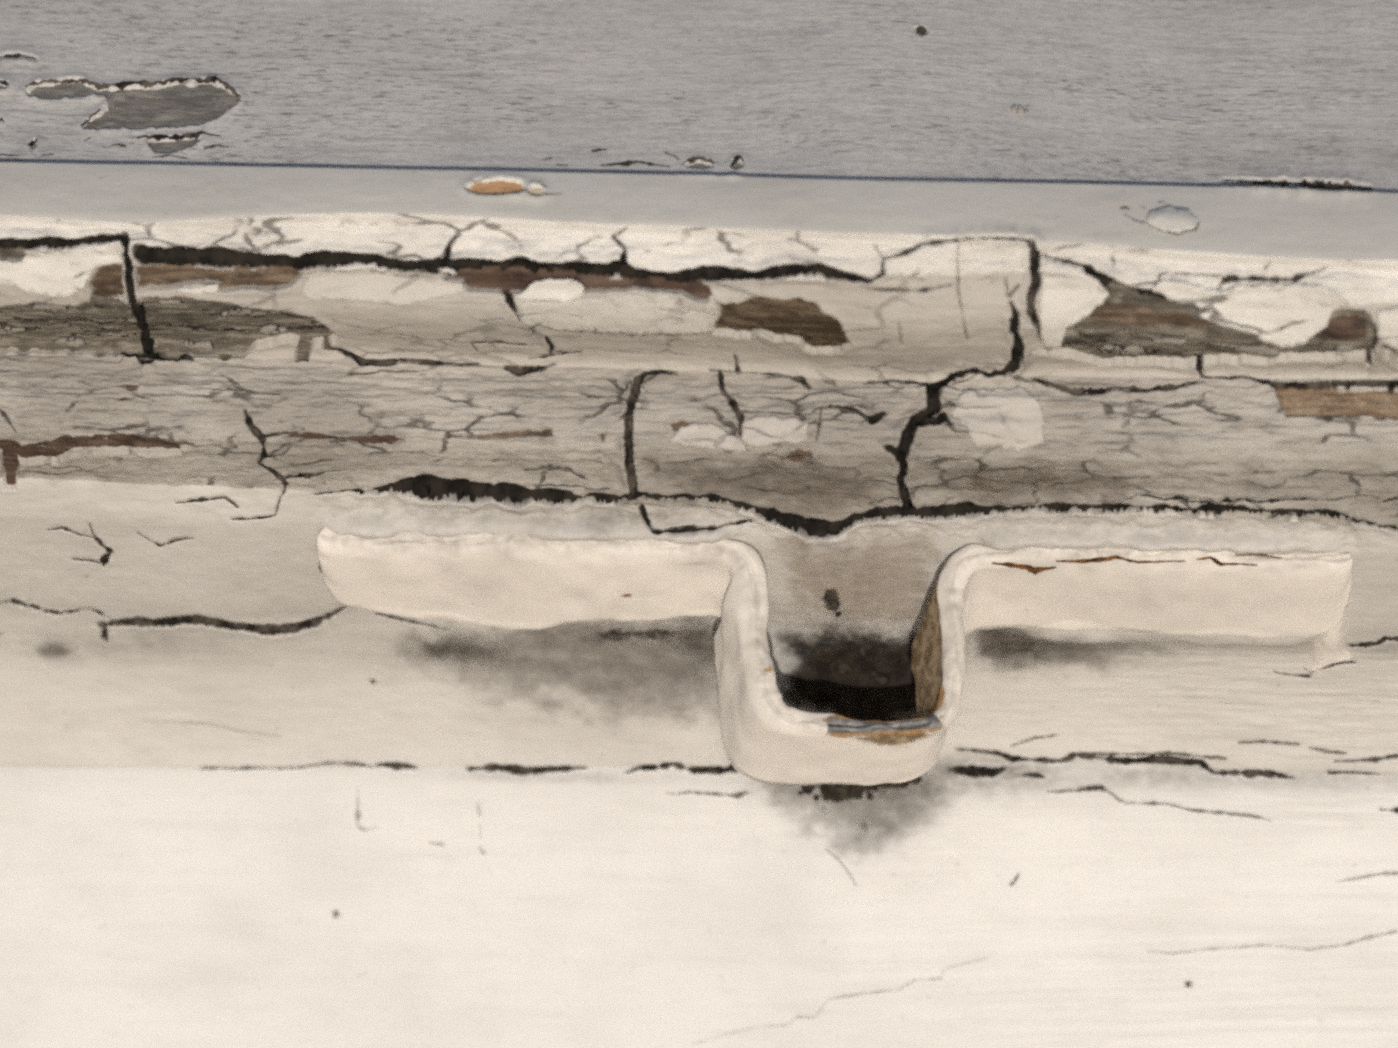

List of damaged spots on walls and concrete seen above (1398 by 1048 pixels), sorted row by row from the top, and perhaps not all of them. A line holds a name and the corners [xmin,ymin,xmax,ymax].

peeling [0,76,240,158]
peeling [0,244,849,362]
peeling [1040,260,1398,358]
crack [0,228,1398,537]
peeling [1276,387,1398,425]
crack [50,524,193,566]
crack [992,554,1282,575]
crack [0,598,448,641]
crack [142,721,416,770]
crack [468,764,587,776]
crack [626,762,749,799]
crack [949,735,1398,821]